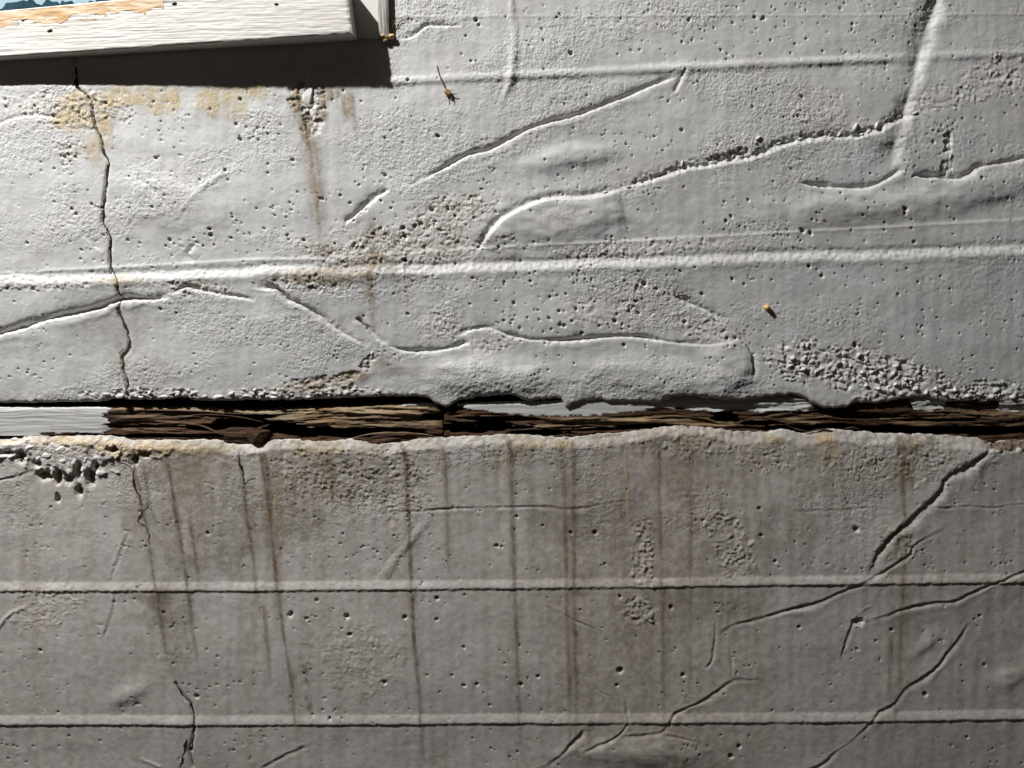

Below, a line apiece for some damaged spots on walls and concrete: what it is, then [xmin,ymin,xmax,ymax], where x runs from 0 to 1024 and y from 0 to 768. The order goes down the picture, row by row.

water stain [57,88,179,156]
water stain [198,85,266,115]
crack [73,58,131,396]
peeling [656,397,813,412]
peeling [909,398,946,412]
peeling [996,398,1024,413]
spalling [0,436,174,494]
crack [123,463,150,545]
crack [176,684,195,768]